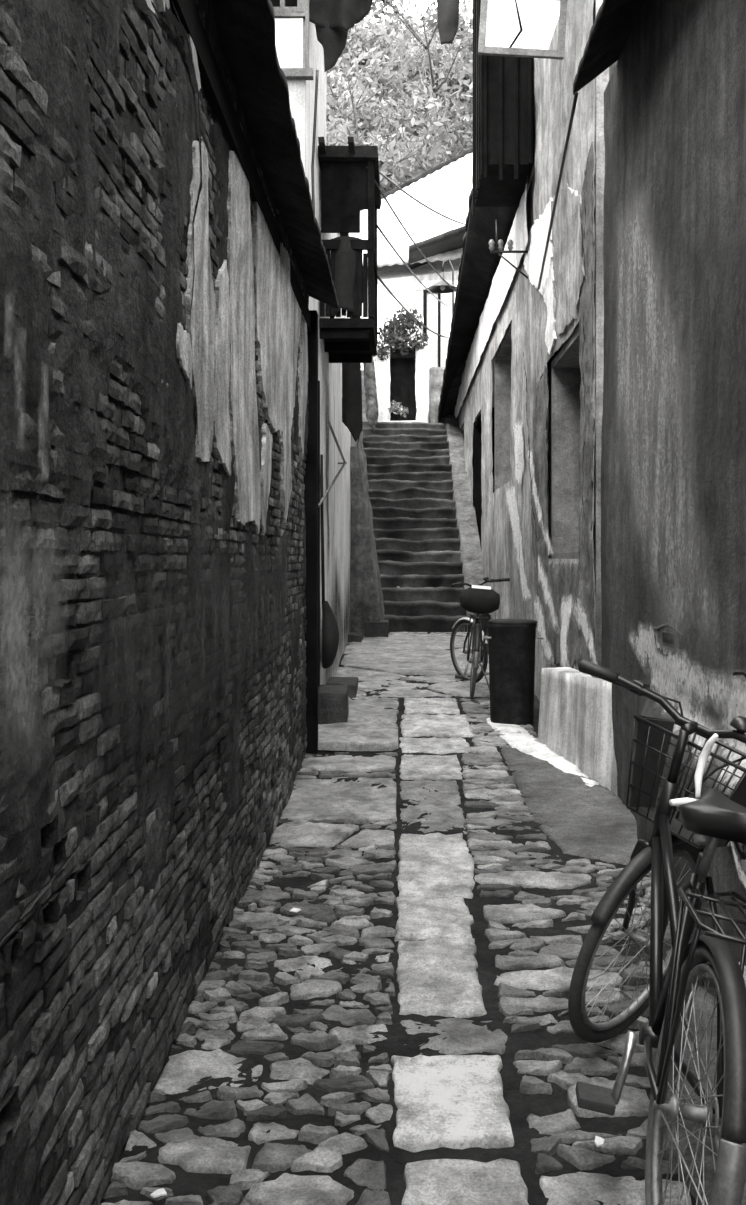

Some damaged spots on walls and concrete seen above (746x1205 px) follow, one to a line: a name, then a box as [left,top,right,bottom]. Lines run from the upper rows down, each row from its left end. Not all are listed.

flaking render [134,0,170,15]
flaking render [183,34,201,92]
flaking render [176,136,308,536]
flaking render [629,622,746,786]
crack [733,671,746,682]
flaking render [727,841,746,888]